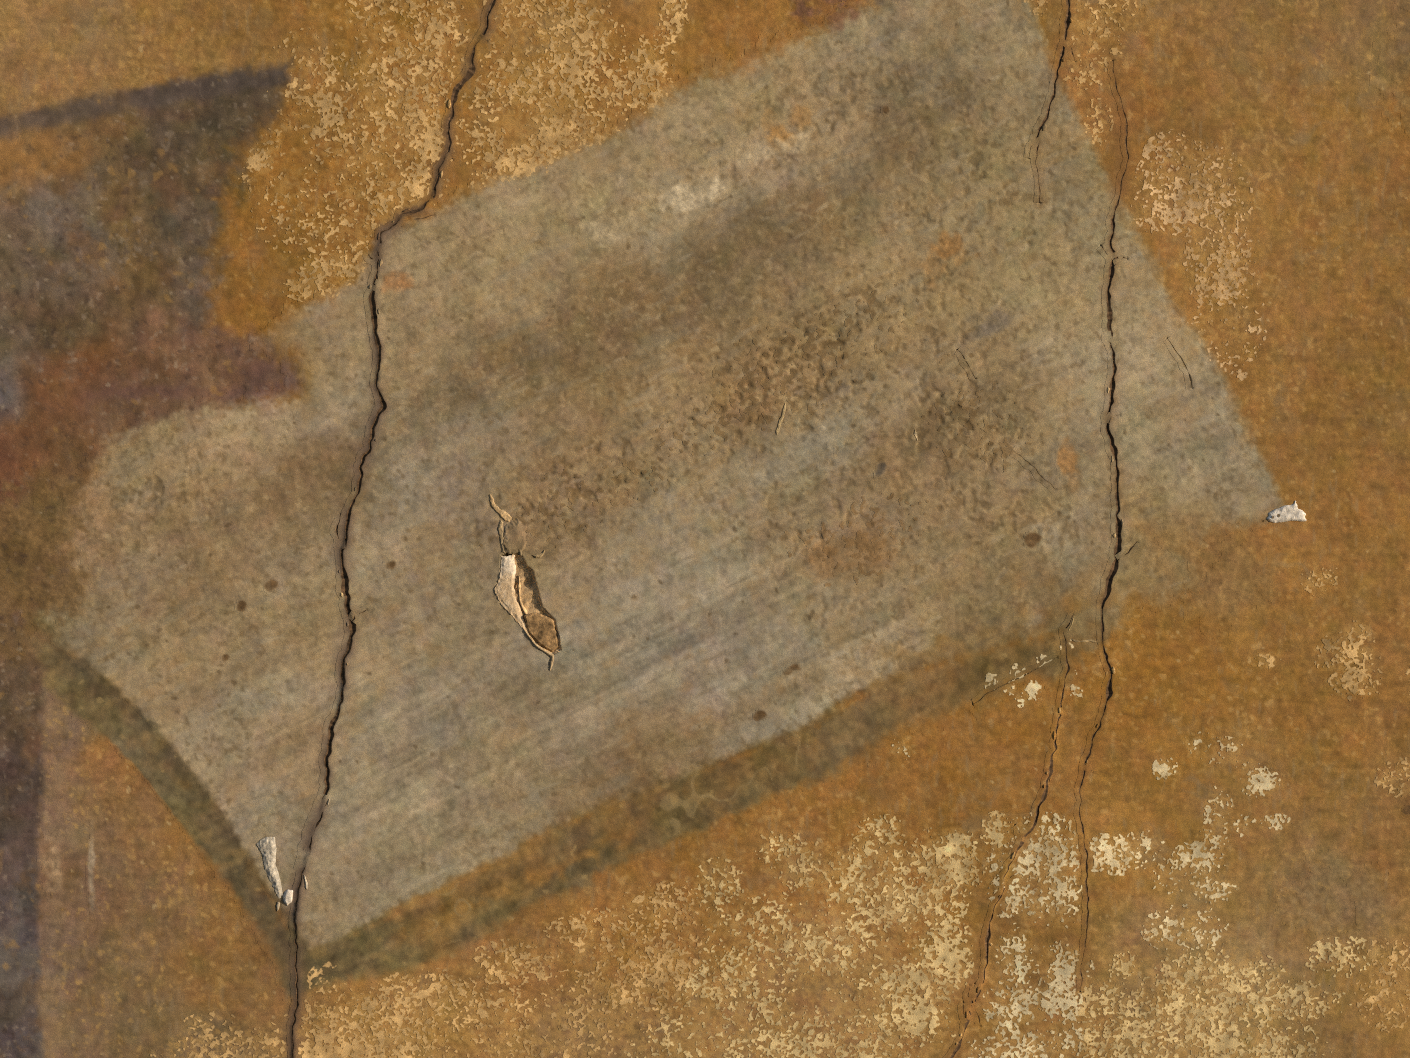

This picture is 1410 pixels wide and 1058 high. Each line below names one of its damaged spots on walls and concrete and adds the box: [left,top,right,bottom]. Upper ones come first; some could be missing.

peeling [238,0,689,302]
efflorescence [578,211,641,249]
efflorescence [652,124,817,217]
peeling [1131,129,1267,381]
crack [286,0,501,1058]
peeling [480,282,931,671]
peeling [984,639,1074,708]
crack [942,0,1140,1058]
water stain [1153,508,1286,636]
water stain [37,807,66,902]
water stain [85,820,97,915]
peeling [150,731,1410,1058]